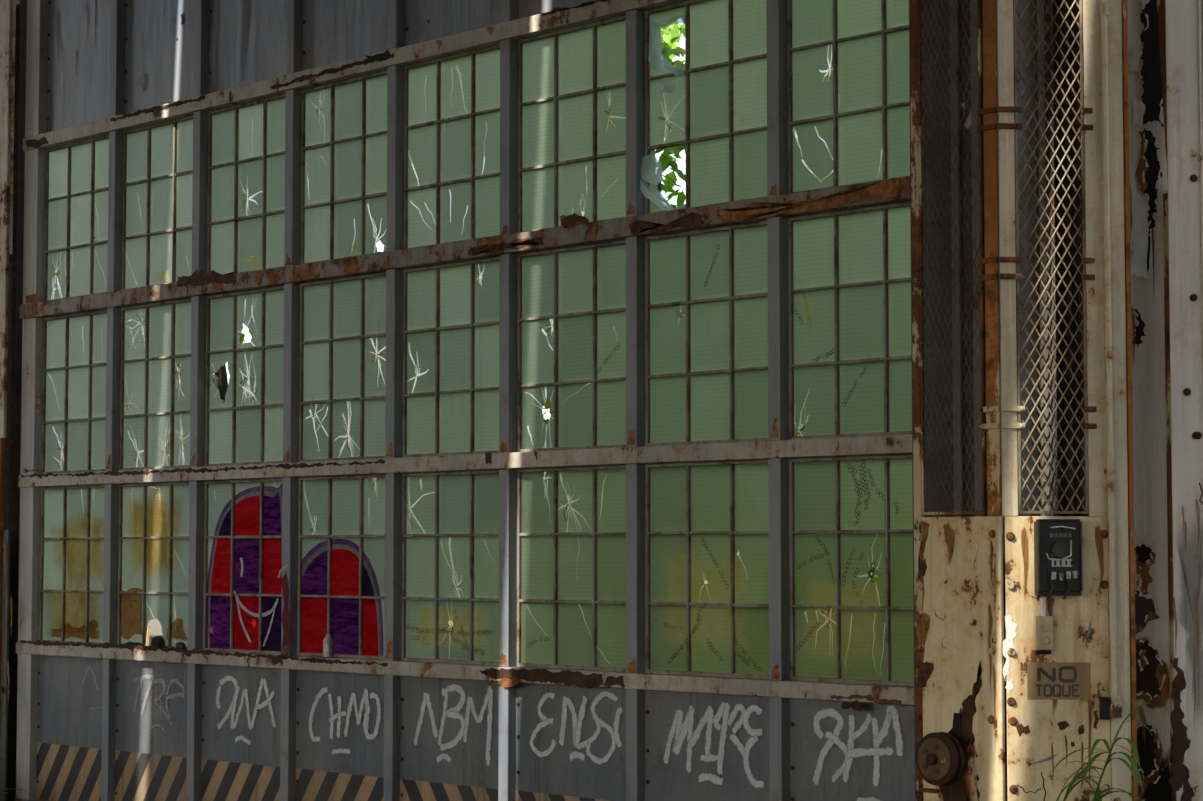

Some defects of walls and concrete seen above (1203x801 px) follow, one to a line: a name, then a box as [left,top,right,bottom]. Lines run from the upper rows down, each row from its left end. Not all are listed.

rust [468,224,542,256]
rust [560,213,589,229]
rust [627,204,703,234]
rust [717,178,899,222]
peeling [1130,97,1156,284]
rust [177,269,234,287]
rust [944,524,955,563]
rust [916,521,934,687]
rust [479,653,636,688]
rust [988,605,996,727]
peeling [948,709,978,801]